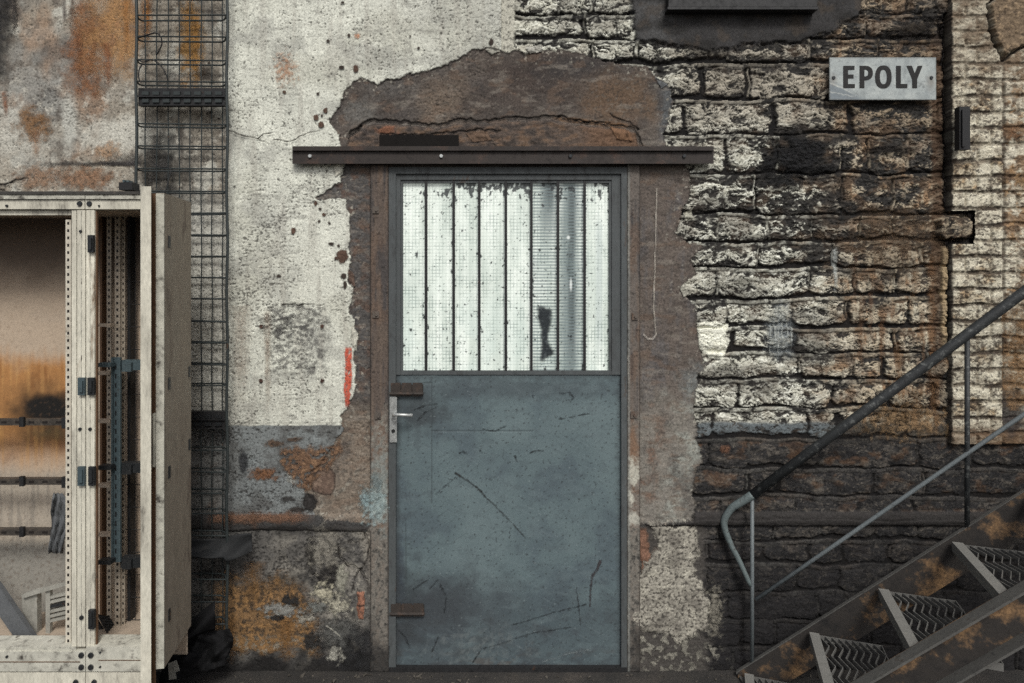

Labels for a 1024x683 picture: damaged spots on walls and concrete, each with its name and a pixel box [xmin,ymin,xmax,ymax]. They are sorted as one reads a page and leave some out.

spalling [313,38,673,146]
spalling [249,164,387,525]
spalling [632,164,722,671]